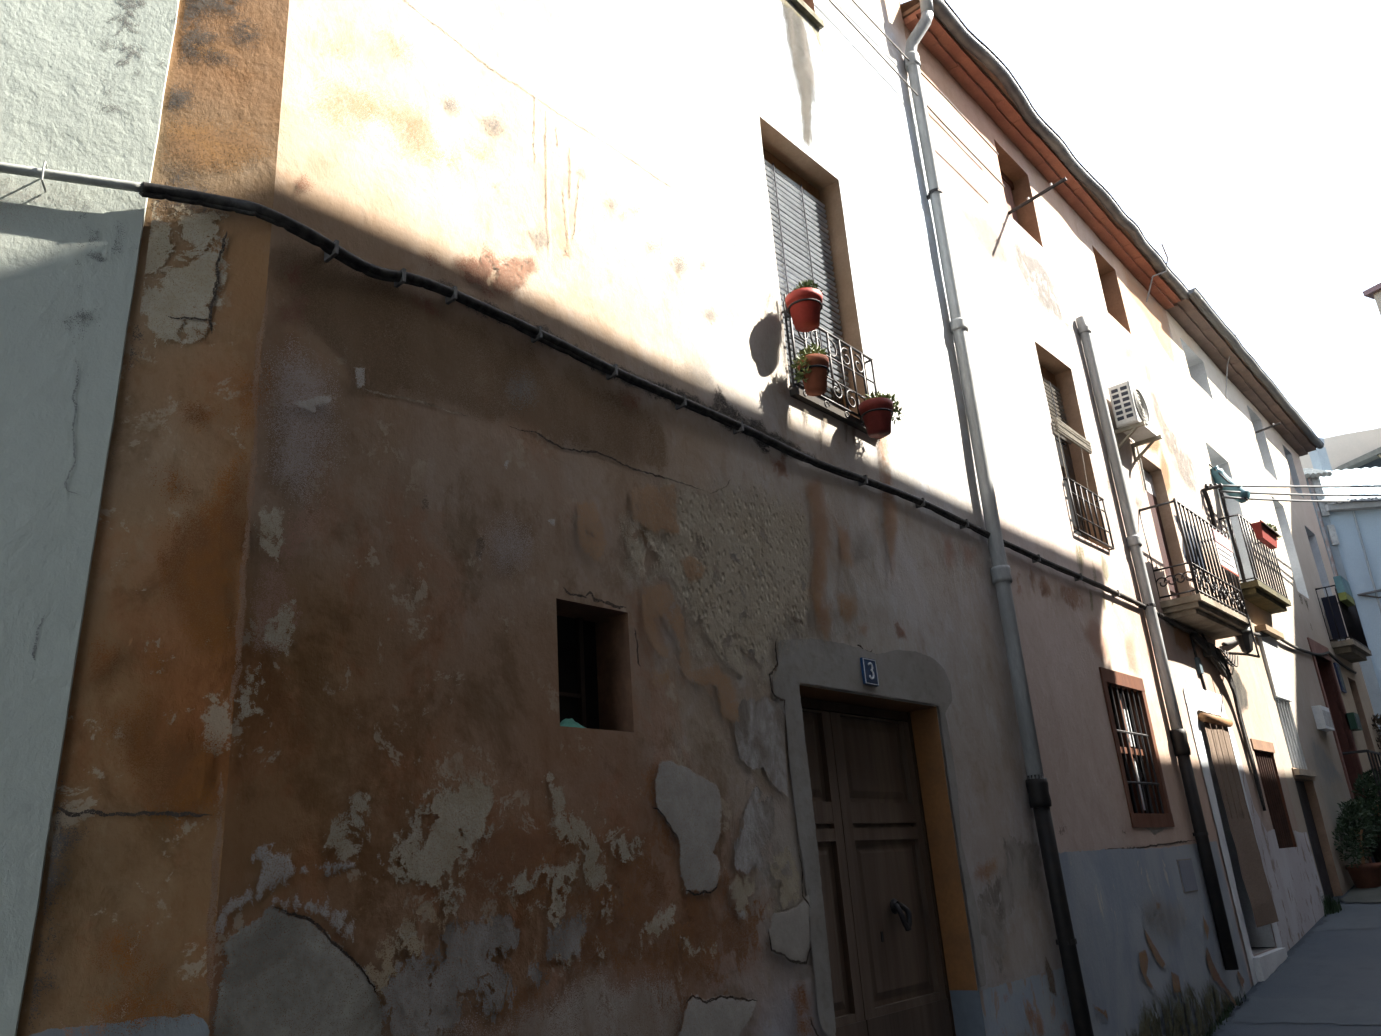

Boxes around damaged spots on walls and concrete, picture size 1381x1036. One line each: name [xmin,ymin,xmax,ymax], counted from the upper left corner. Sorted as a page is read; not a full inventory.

damp [746,0,824,155]
crack [168,232,227,331]
damp [963,209,1078,337]
crack [64,359,82,497]
crack [509,426,730,494]
crack [52,806,209,818]
peeling [323,791,371,863]
peeling [729,696,801,919]
peeling [365,771,645,1036]
flaking render [630,904,717,959]